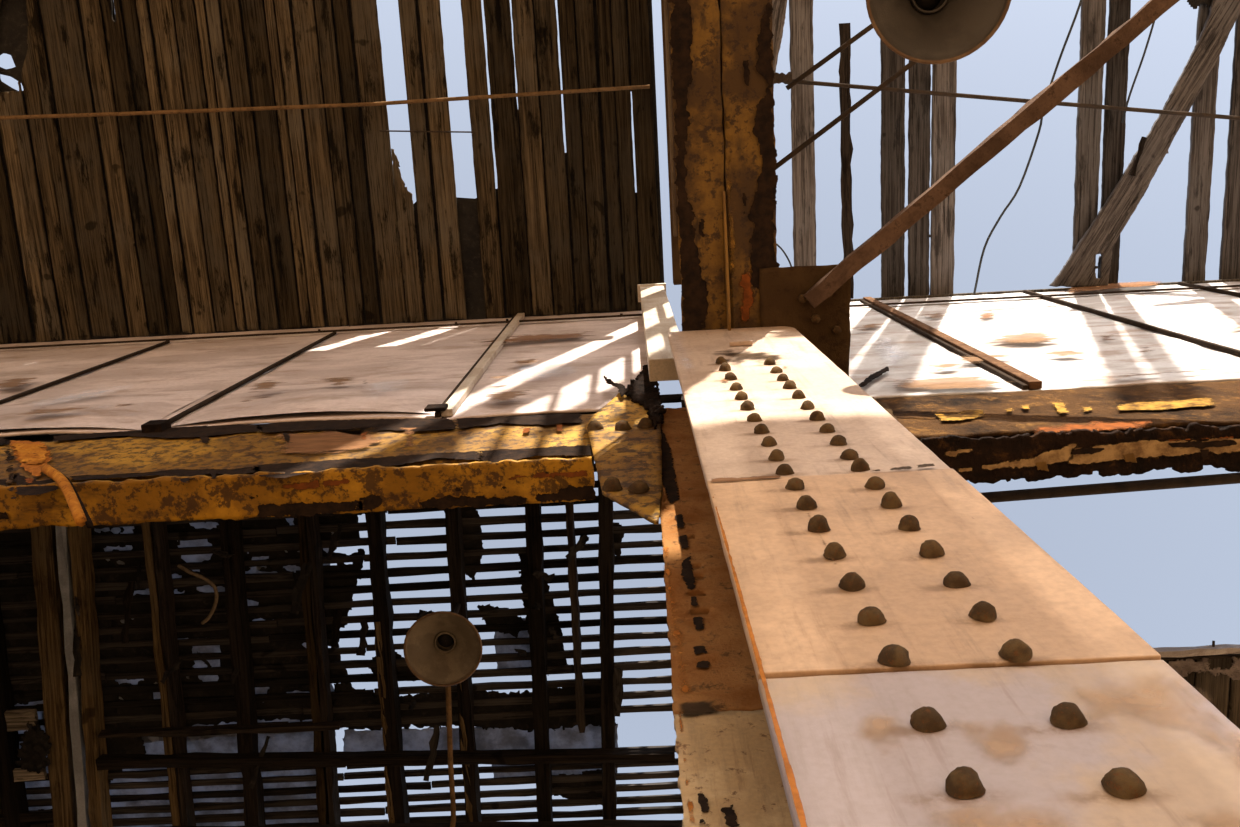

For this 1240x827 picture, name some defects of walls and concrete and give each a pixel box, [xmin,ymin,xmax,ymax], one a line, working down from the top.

corrosion [739,272,754,322]
corrosion [719,351,781,364]
peeling [935,410,985,421]
peeling [1052,402,1093,414]
peeling [1117,398,1215,410]
corrosion [1038,421,1151,433]
corrosion [1071,447,1104,455]
peeling [945,438,1240,472]
corrosion [1168,436,1237,458]
corrosion [624,362,717,732]
corrosion [713,497,807,827]
corrosion [686,780,740,827]